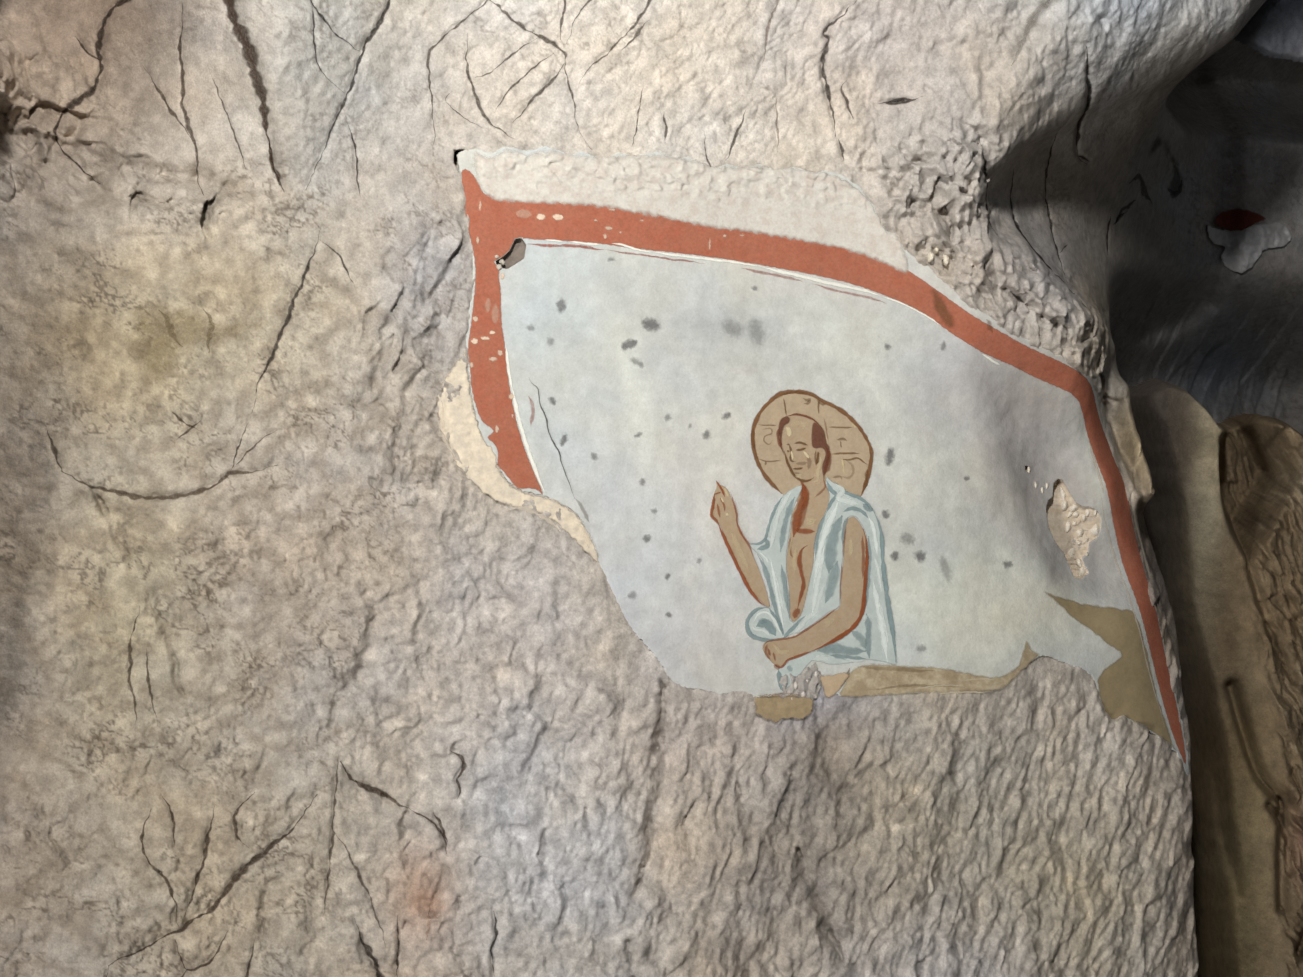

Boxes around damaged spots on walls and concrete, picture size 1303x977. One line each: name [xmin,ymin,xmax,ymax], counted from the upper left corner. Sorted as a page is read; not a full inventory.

flaking render [495,238,526,279]
flaking render [438,331,598,561]
flaking render [1025,466,1101,579]
flaking render [755,663,848,722]